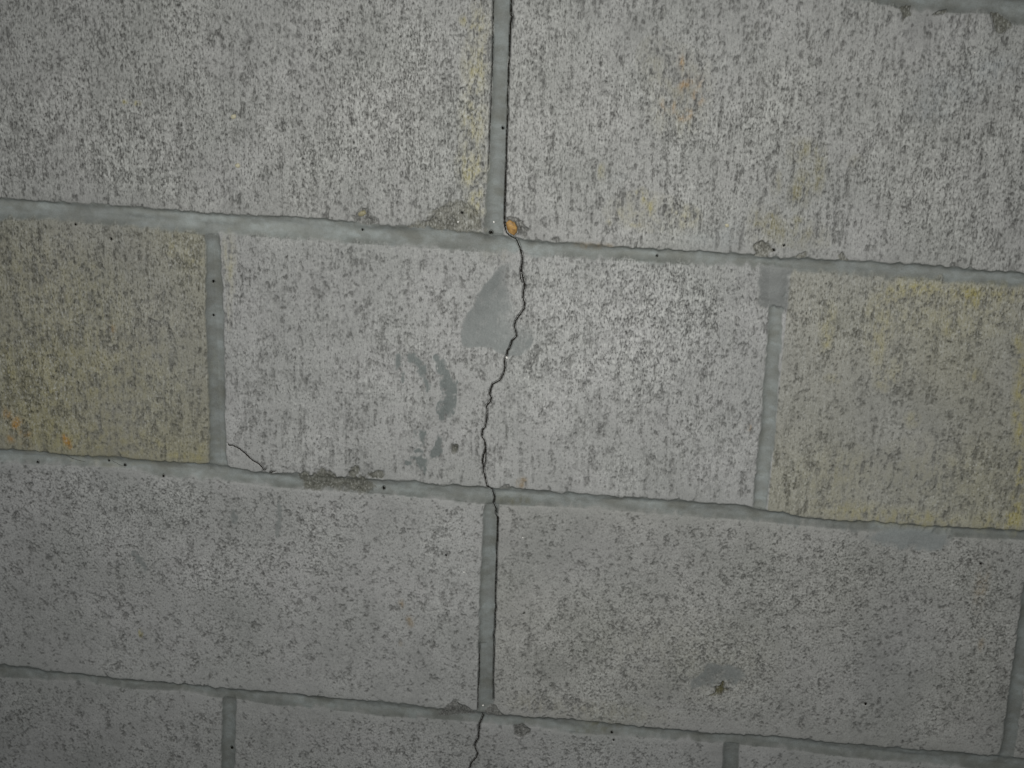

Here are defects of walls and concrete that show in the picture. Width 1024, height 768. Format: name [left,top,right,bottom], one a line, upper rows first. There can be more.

crack [470,0,525,767]